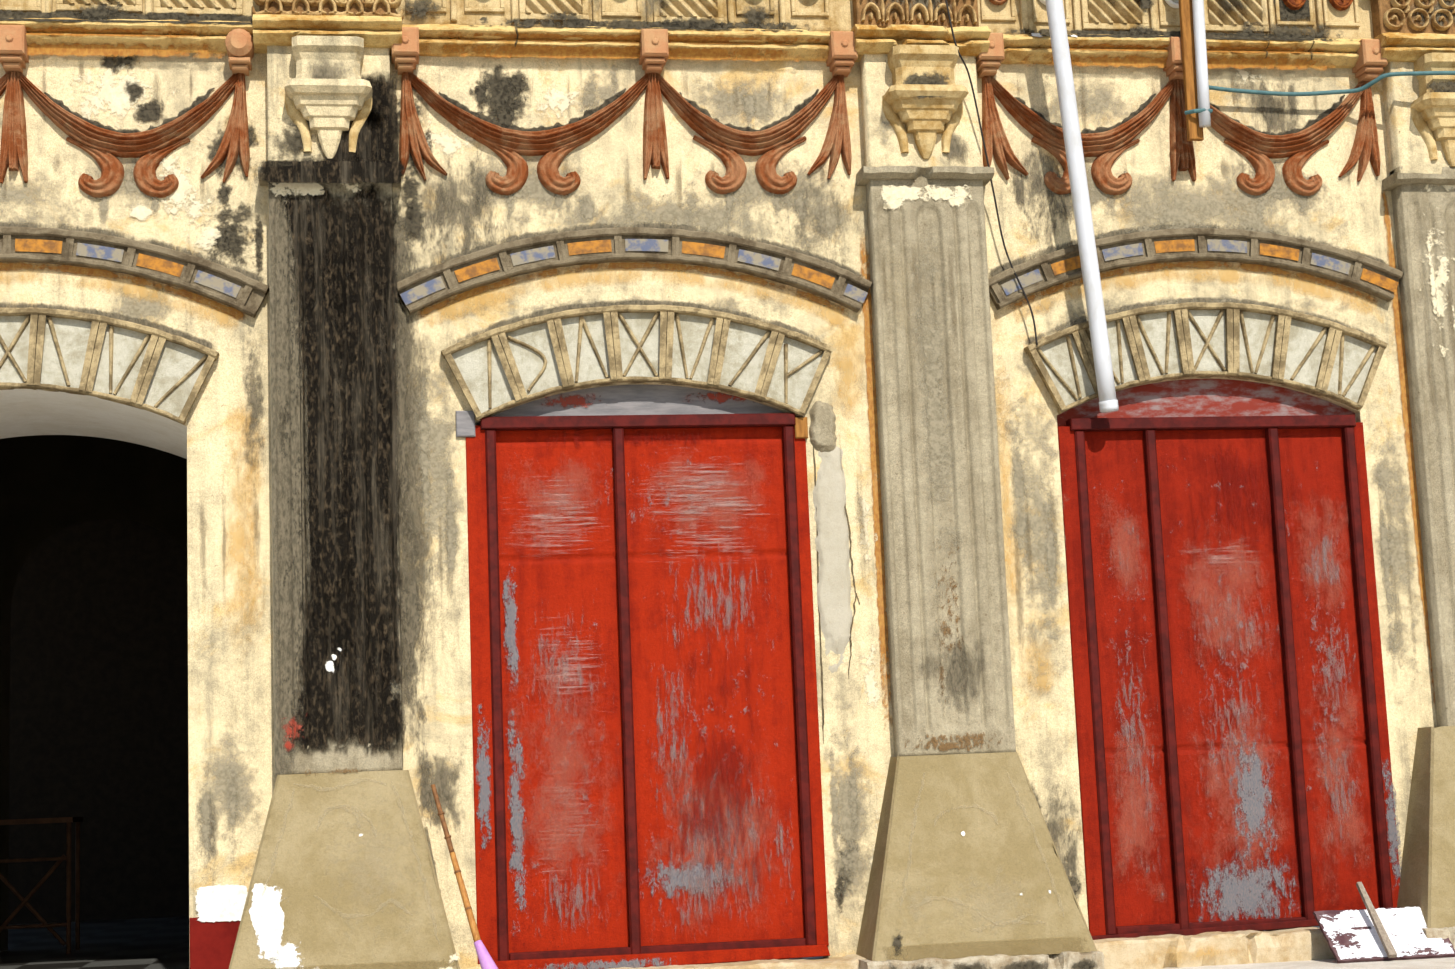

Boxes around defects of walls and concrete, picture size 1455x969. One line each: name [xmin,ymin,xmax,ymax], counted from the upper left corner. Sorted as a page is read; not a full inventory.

damp [0,179,47,228]
peeling [881,184,972,210]
peeling [1419,184,1455,357]
damp [0,281,212,348]
damp [44,55,861,777]
damp [199,734,253,856]
damp [419,754,460,826]